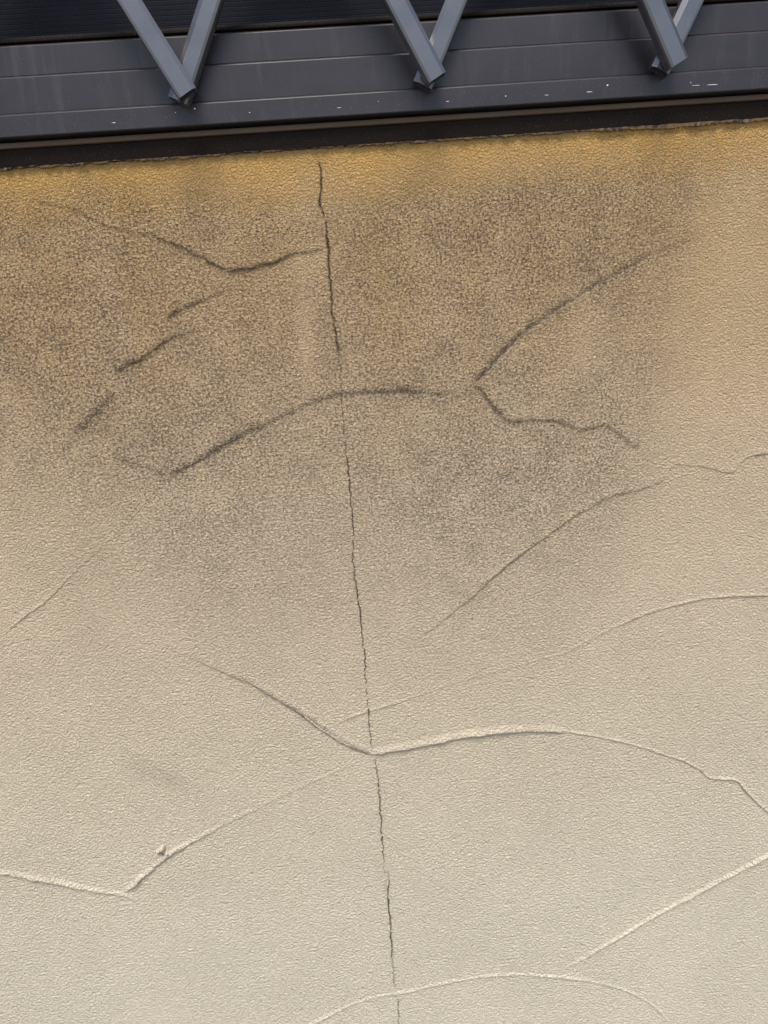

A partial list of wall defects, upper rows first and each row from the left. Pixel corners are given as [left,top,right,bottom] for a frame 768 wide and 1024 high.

leakage [0,121,768,212]
leakage [0,268,149,405]
crack [117,163,341,375]
leakage [443,195,634,286]
crack [342,409,400,1023]